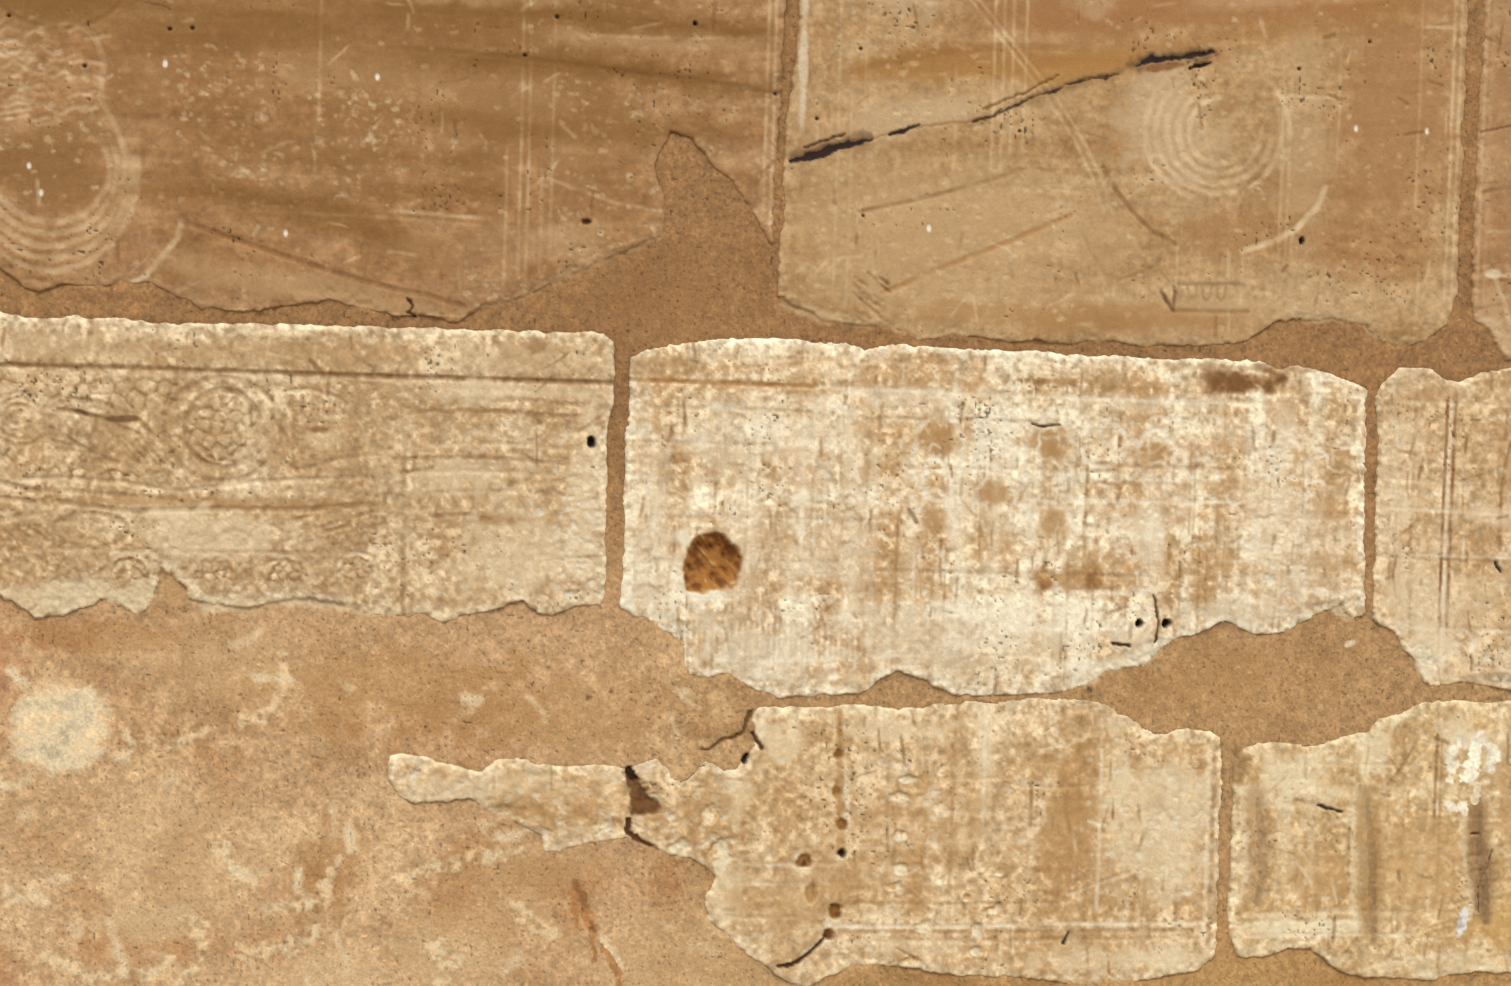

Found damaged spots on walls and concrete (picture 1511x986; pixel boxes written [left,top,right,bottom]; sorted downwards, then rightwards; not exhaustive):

crack [787,42,1220,165]
crack [1478,123,1511,135]
spalling [469,229,664,314]
spalling [1075,637,1171,691]
crack [699,708,765,765]
spalling [620,766,663,849]
leakage [1349,780,1390,946]
leakage [1442,729,1504,939]